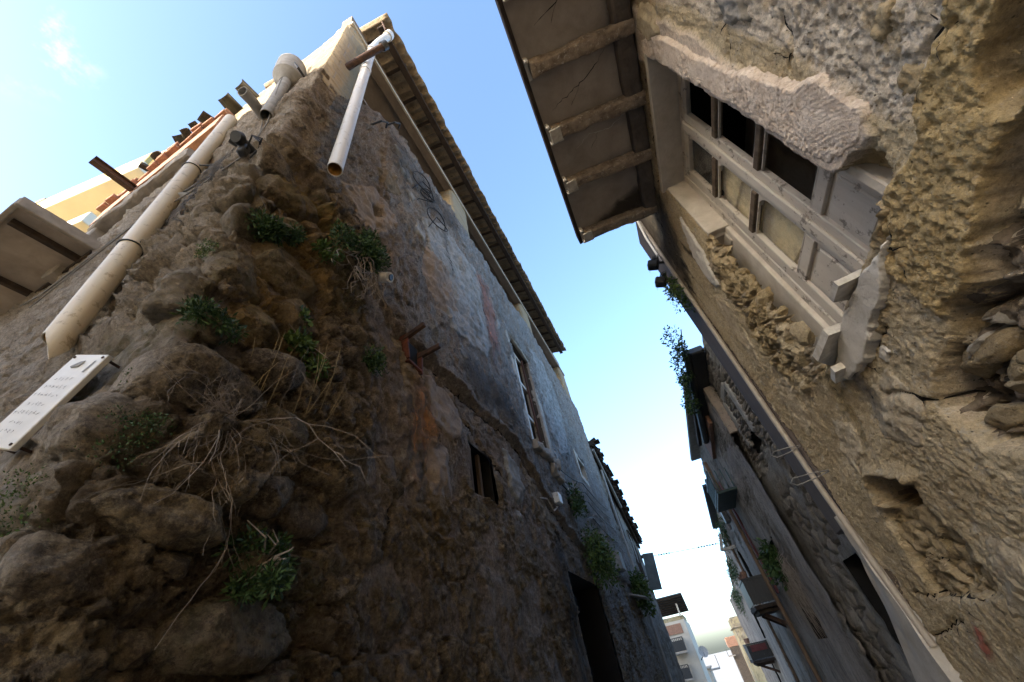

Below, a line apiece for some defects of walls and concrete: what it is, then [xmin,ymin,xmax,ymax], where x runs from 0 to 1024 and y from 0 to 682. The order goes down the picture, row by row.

spalling [870,0,896,45]
spalling [897,63,925,96]
spalling [679,217,821,366]
peeling [836,199,892,380]
spalling [960,216,1024,436]
spalling [872,487,1003,598]